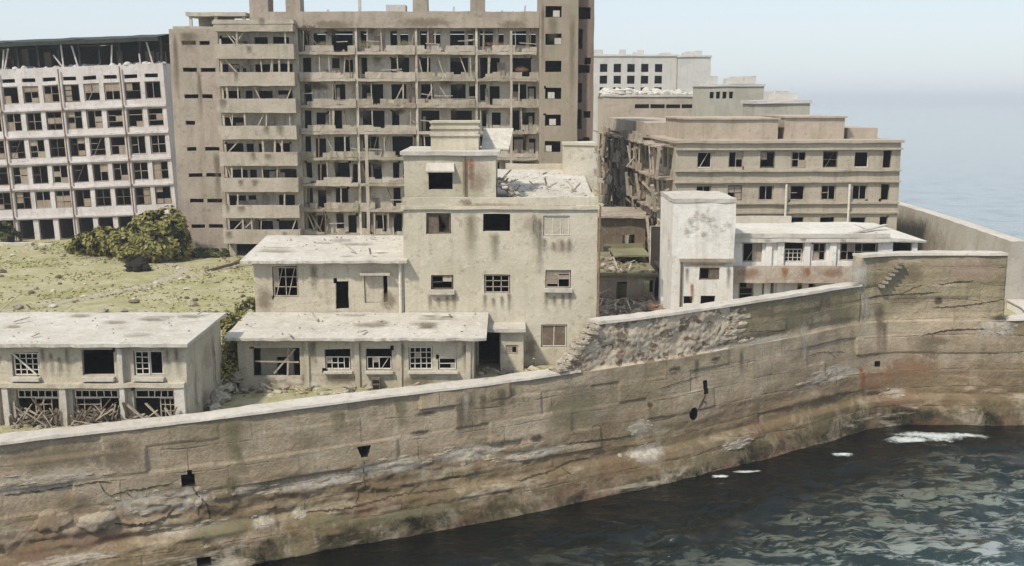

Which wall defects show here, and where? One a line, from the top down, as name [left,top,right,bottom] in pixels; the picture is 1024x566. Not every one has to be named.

crack [850,280,1012,340]
spalling [548,322,602,374]
crack [4,481,220,527]
crack [306,462,454,513]